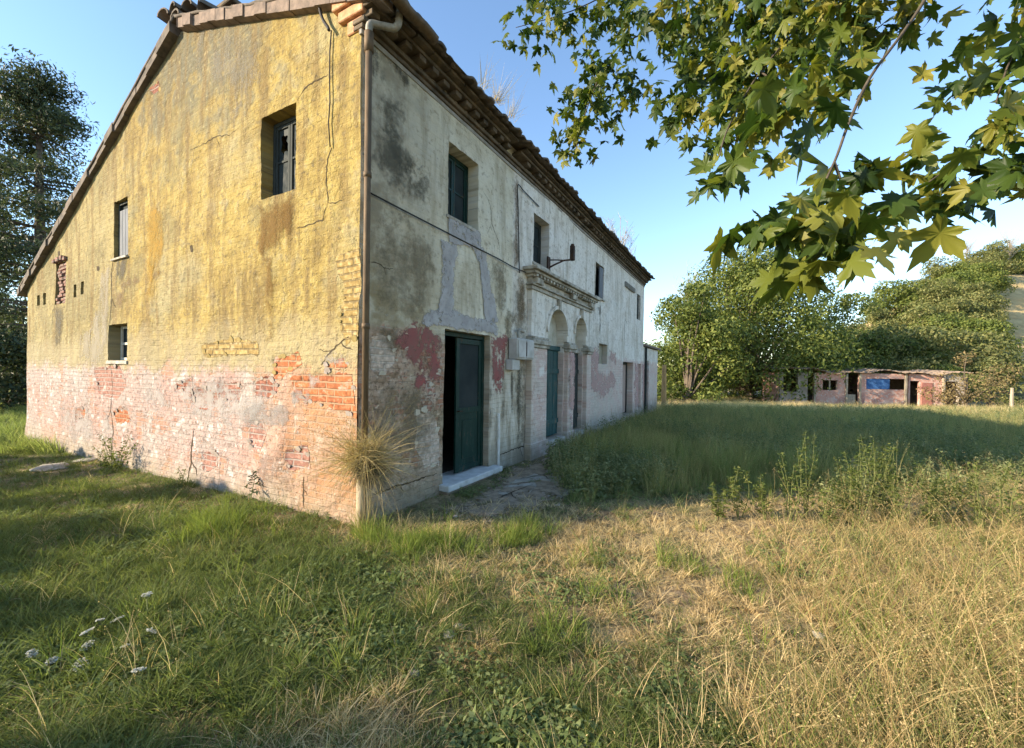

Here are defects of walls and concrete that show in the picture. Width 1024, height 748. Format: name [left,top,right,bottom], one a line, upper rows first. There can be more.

leakage [380,101,425,195]
crack [298,147,342,228]
flaking render [336,247,361,345]
flaking render [94,364,131,423]
flaking render [174,377,243,411]
peeling [201,335,259,358]
flaking render [255,352,356,418]
crack [319,336,353,365]
peeling [370,322,442,468]
peeling [491,333,508,393]
flaking render [246,418,266,452]
flaking render [285,445,310,471]